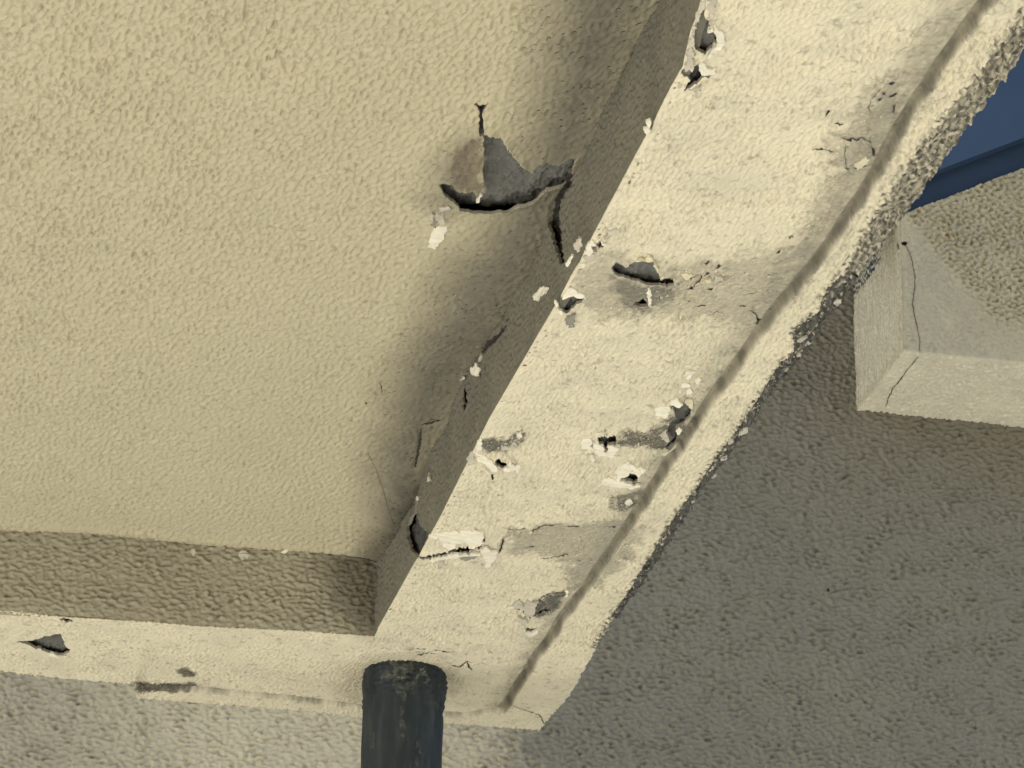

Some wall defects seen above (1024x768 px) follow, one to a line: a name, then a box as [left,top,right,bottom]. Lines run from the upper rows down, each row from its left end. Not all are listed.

spalling [684,0,725,93]
peeling [427,129,574,249]
crack [552,173,572,262]
spalling [532,286,585,328]
spalling [612,255,725,314]
crack [886,245,920,405]
spalling [611,272,862,619]
peeling [411,369,702,637]
spalling [26,634,69,658]